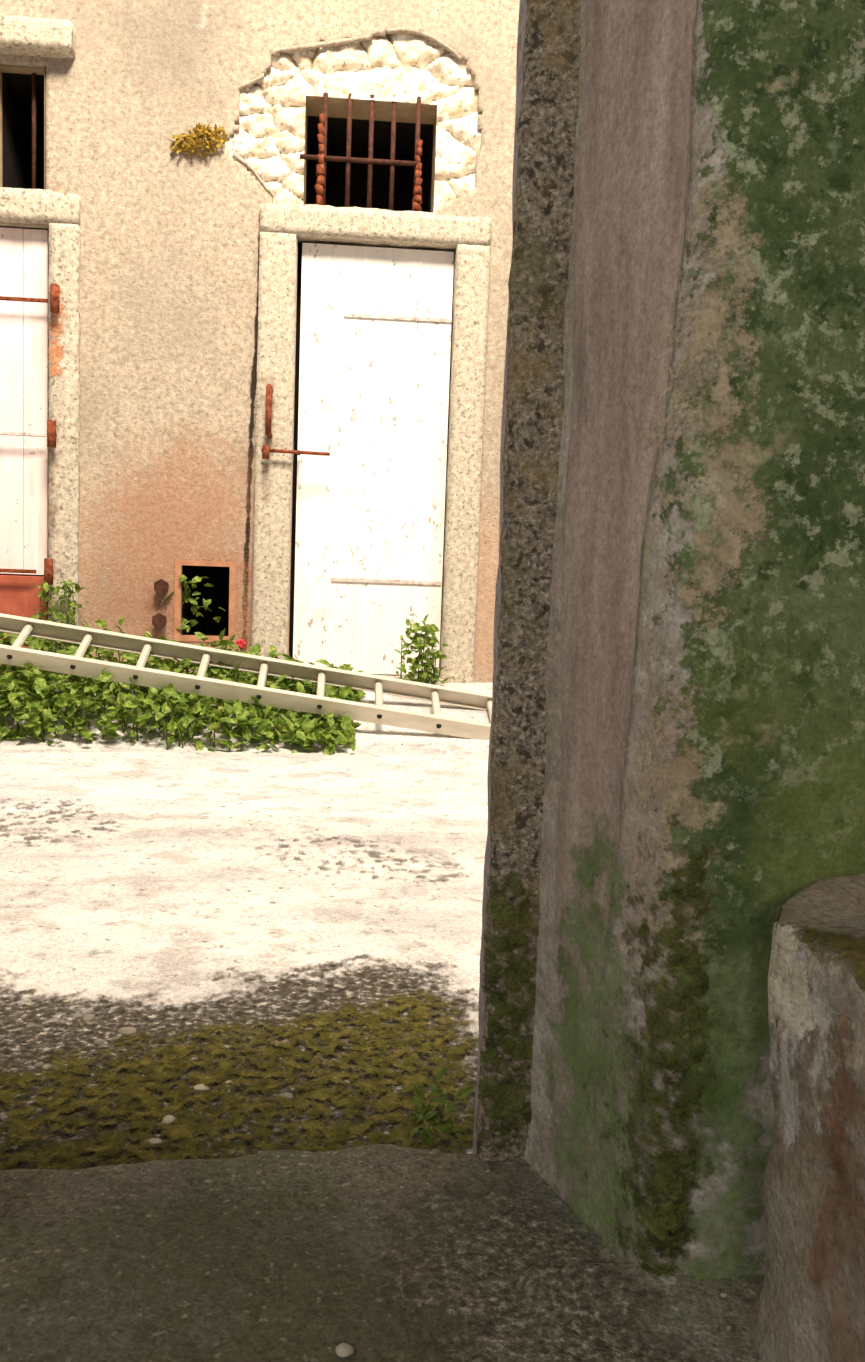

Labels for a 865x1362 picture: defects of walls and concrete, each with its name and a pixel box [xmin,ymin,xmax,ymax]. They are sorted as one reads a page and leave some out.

corrosion [315,113,326,205]
corrosion [412,139,423,211]